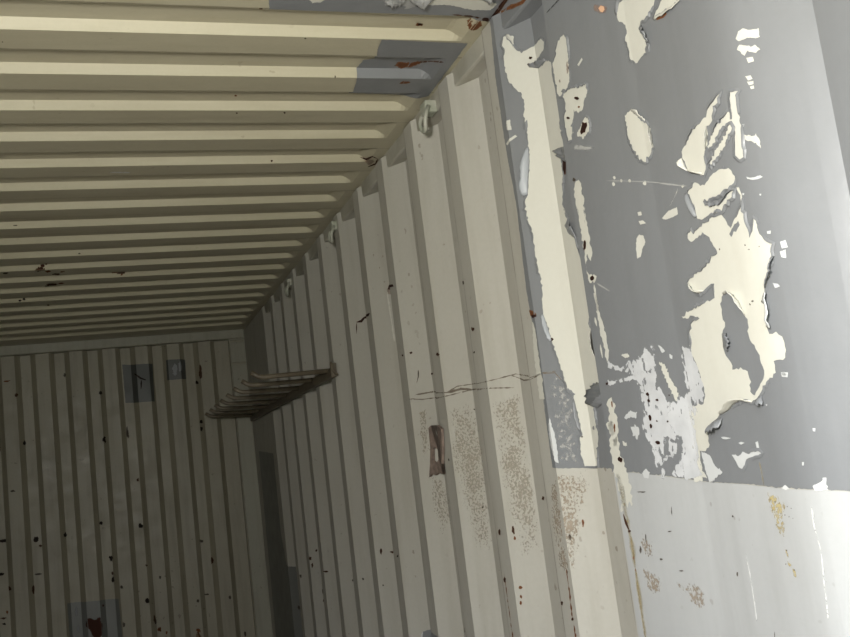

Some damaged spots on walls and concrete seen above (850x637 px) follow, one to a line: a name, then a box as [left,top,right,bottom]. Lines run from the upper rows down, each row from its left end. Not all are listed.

peeling [383,0,497,11]
corrosion [454,0,526,31]
peeling [614,0,681,64]
peeling [736,28,760,63]
corrosion [395,61,443,69]
peeling [623,109,654,165]
peeling [500,32,602,468]
peeling [636,235,645,259]
peeling [662,75,788,483]
corrosion [86,617,102,637]